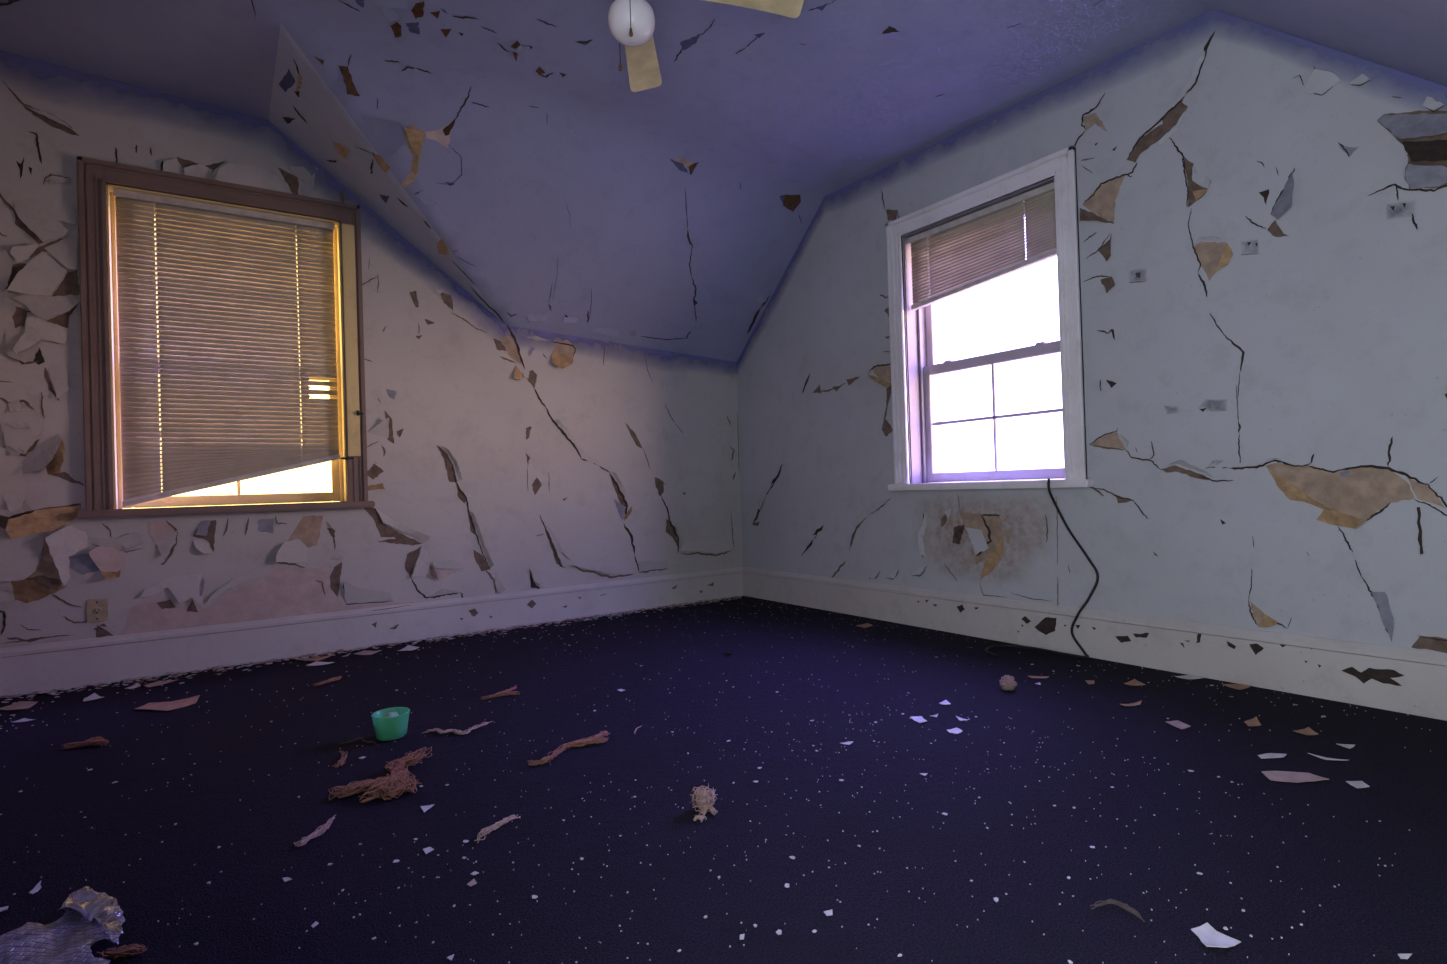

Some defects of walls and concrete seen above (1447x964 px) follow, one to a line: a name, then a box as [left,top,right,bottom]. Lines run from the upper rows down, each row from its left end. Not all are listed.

crack [674,19,715,62]
crack [1074,31,1215,245]
peeling [135,145,315,196]
crack [1396,187,1418,229]
peeling [0,193,85,486]
crack [362,250,783,599]
crack [1125,386,1241,482]
crack [1090,487,1148,519]
peeling [1205,436,1447,554]
spalling [1017,616,1096,635]
flaking render [1411,636,1447,653]
spalling [1342,667,1404,686]